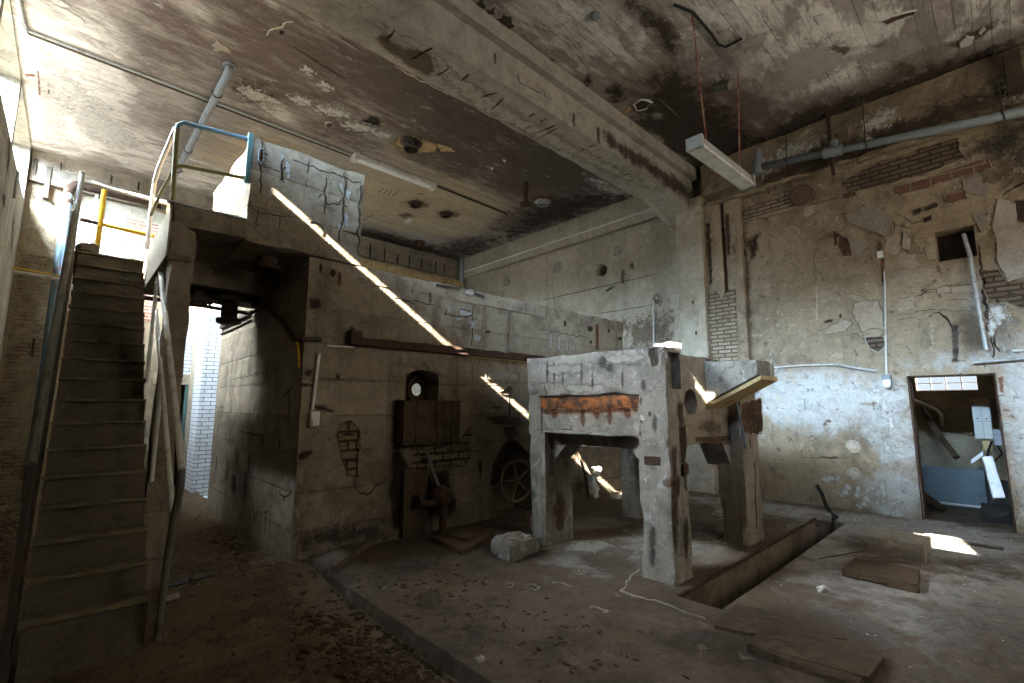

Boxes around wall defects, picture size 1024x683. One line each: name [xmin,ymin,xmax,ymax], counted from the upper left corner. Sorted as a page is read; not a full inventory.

damp [752,22,1024,192]
crack [253,137,445,273]
spalling [840,137,1024,312]
spalling [708,288,739,361]
flaking render [817,299,889,353]
crack [898,246,1001,358]
spalling [336,419,361,478]
rust [543,408,651,436]